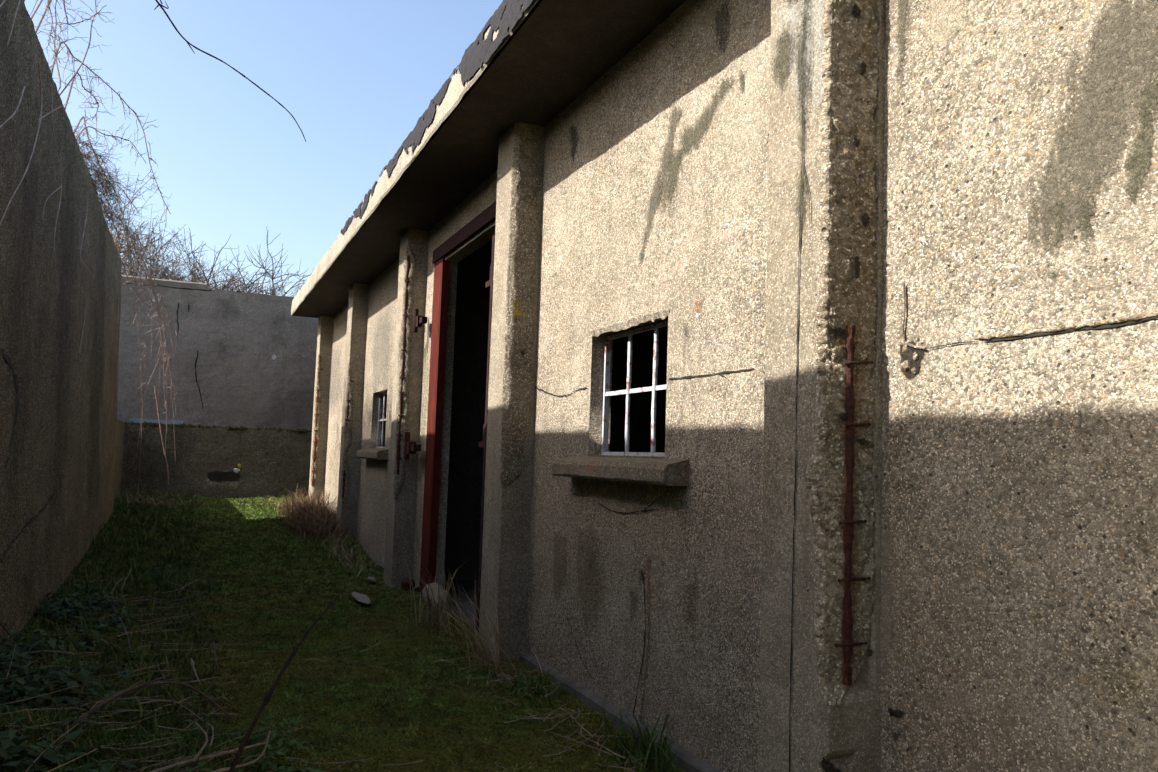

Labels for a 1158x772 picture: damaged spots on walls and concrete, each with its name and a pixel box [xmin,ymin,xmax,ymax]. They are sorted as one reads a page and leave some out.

peeling [341,0,532,234]
leakage [657,70,745,212]
leakage [1028,0,1158,278]
spalling [805,0,879,705]
crack [919,312,1158,350]
spalling [815,755,853,772]